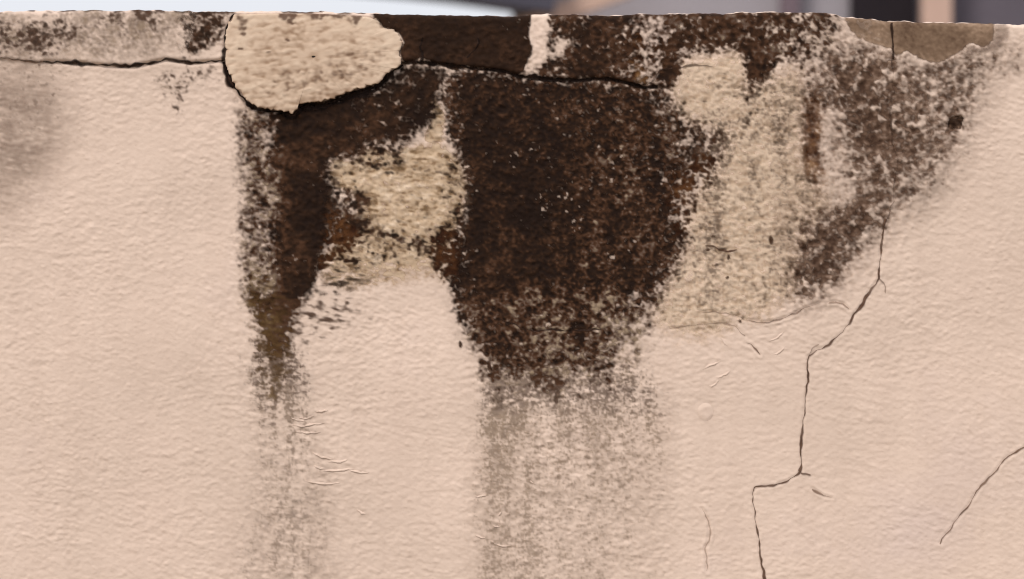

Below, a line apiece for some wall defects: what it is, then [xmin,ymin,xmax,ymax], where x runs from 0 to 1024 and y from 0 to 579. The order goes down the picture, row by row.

flaking render [225,14,403,114]
crack [9,14,712,119]
crack [888,23,896,59]
spalling [845,17,994,63]
leakage [236,12,1005,441]
crack [741,311,800,354]
crack [752,218,887,579]
crack [940,447,1024,544]